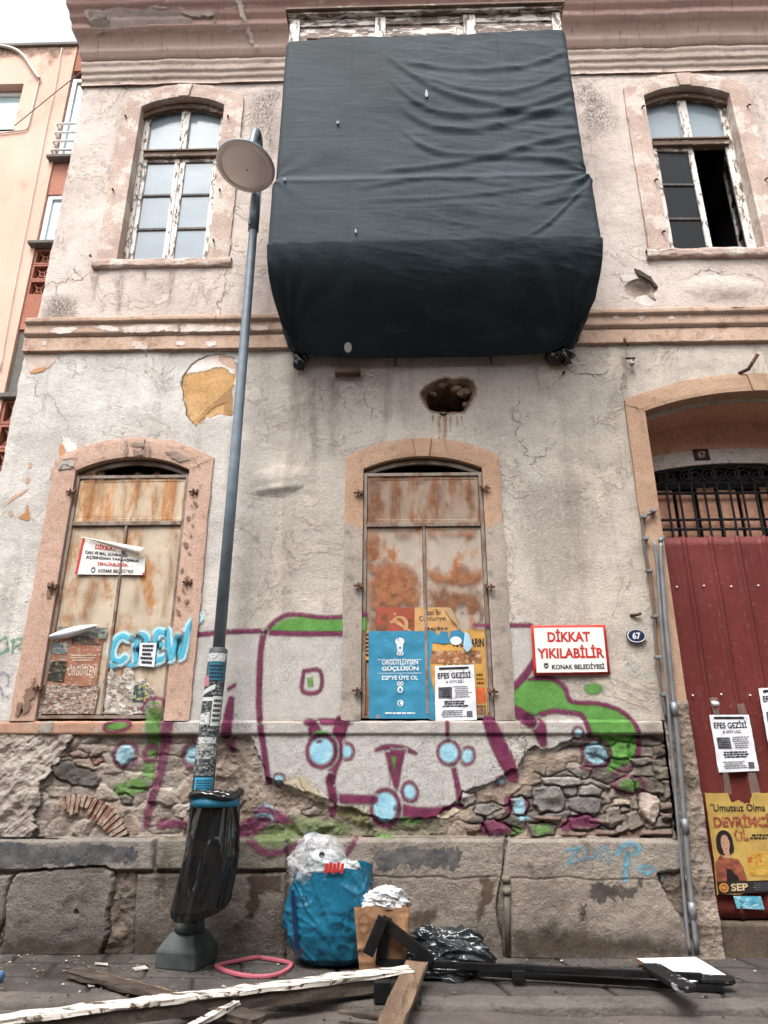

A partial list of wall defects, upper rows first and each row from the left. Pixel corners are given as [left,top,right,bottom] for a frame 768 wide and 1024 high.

peeling [84,5,214,34]
flaking render [93,323,268,426]
spalling [419,376,477,416]
crack [510,385,556,462]
rust [367,533,482,631]
flaking render [32,735,198,838]
flaking render [214,721,677,839]